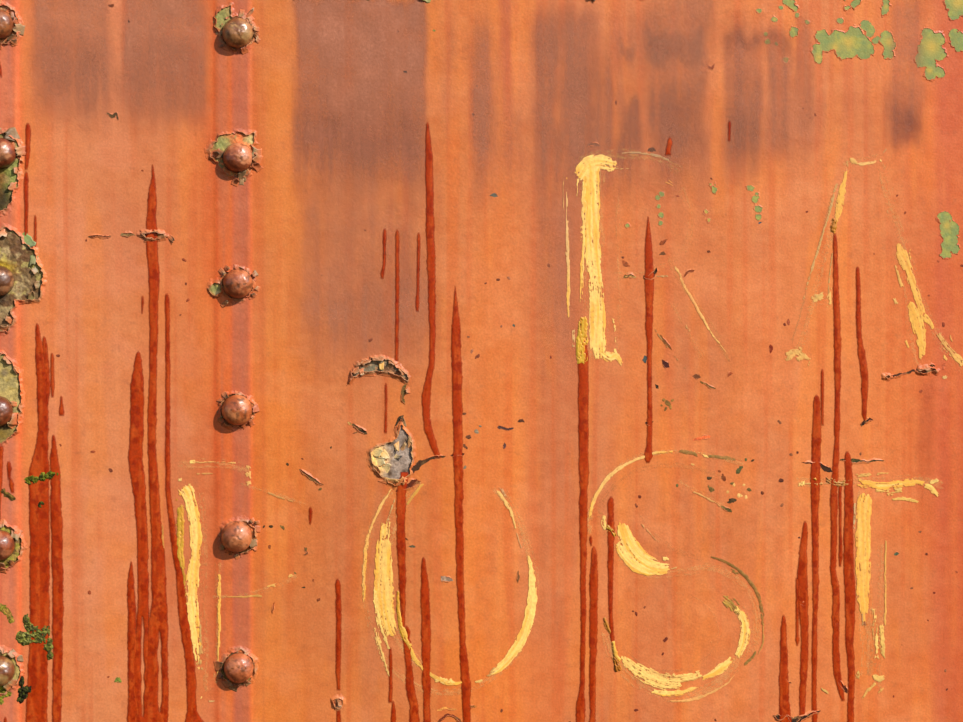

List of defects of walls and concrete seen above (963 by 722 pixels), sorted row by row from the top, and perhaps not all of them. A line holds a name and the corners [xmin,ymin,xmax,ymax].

peeling [756,0,897,64]
peeling [914,0,963,82]
peeling [0,127,47,336]
peeling [935,211,963,267]
peeling [0,350,25,447]
corrosion [26,324,64,722]
corrosion [127,165,203,722]
peeling [346,354,416,490]
corrosion [396,472,431,722]
corrosion [451,288,471,722]
corrosion [576,341,615,722]
corrosion [779,234,856,722]